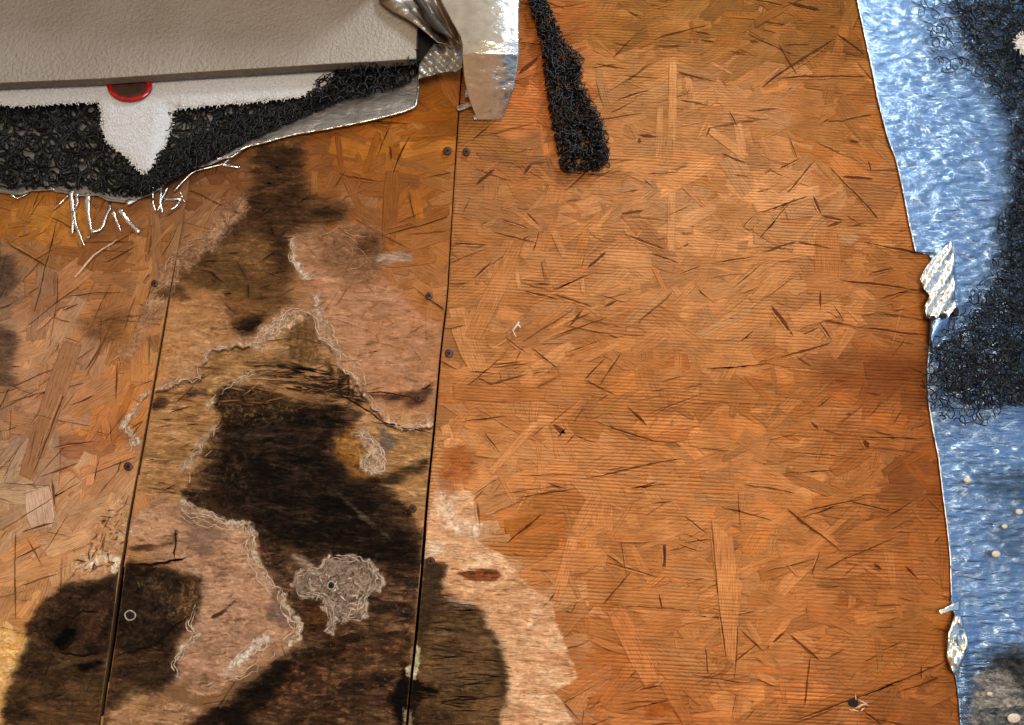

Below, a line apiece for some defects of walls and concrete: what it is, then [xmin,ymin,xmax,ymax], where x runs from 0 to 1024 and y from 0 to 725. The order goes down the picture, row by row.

leakage [0,138,577,725]